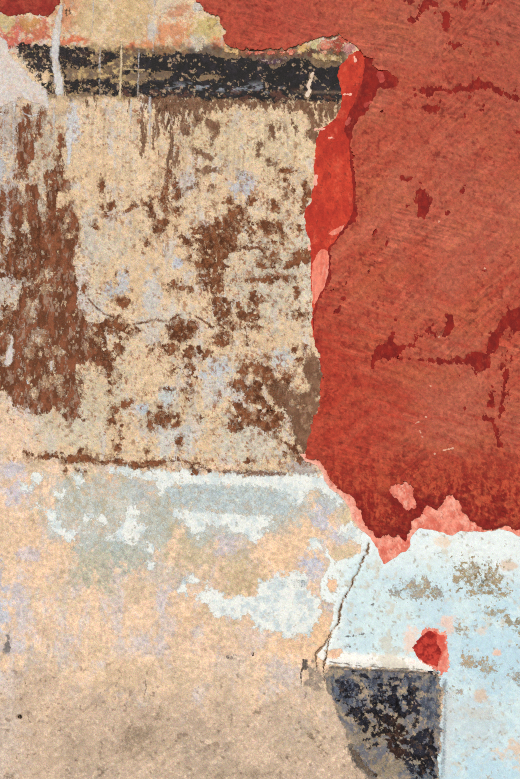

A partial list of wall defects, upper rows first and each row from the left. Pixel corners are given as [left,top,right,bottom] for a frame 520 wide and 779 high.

peeling [403,0,494,55]
peeling [413,76,520,114]
peeling [224,37,399,337]
peeling [400,175,433,219]
corrosion [0,103,324,477]
peeling [371,306,520,448]
peeling [337,521,362,545]
peeling [389,481,417,511]
crack [300,543,369,685]
peeling [388,546,520,646]
flaking render [324,619,468,779]
peeling [461,650,520,687]